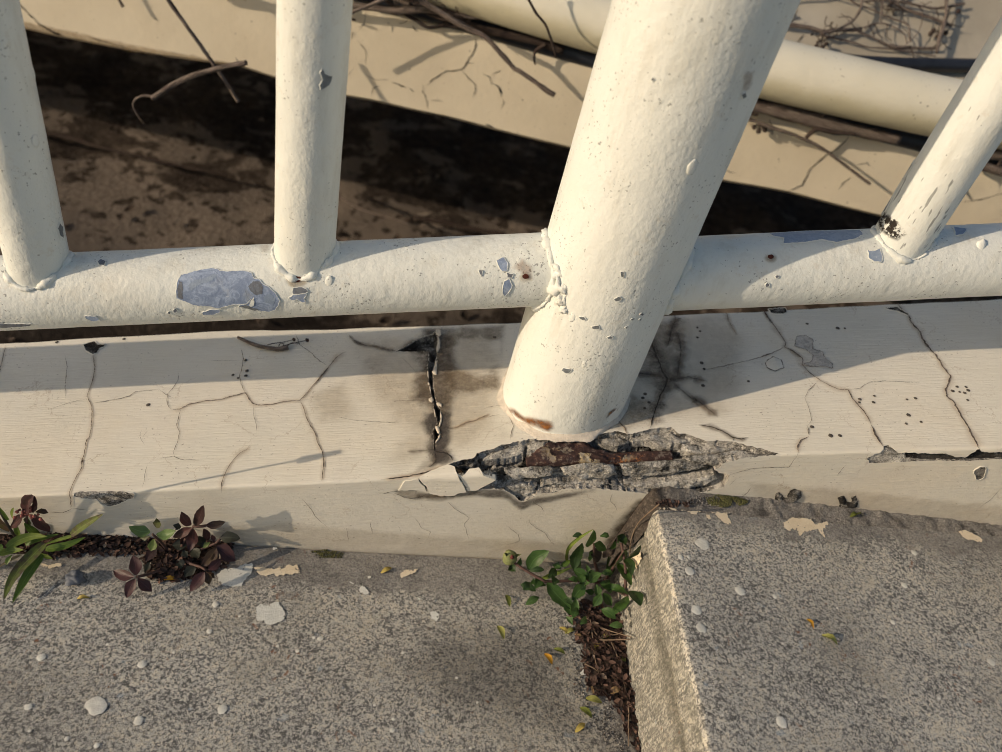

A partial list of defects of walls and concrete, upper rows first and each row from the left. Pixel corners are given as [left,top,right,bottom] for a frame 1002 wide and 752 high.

peeling [768,229,864,244]
peeling [867,248,883,263]
peeling [167,267,309,315]
crack [899,306,979,448]
crack [48,335,392,513]
corrosion [510,410,551,430]
crack [639,311,917,497]
peeling [73,490,136,507]
peeling [398,479,426,491]
crack [381,450,469,538]
spalling [455,429,769,499]
spalling [867,446,1002,481]